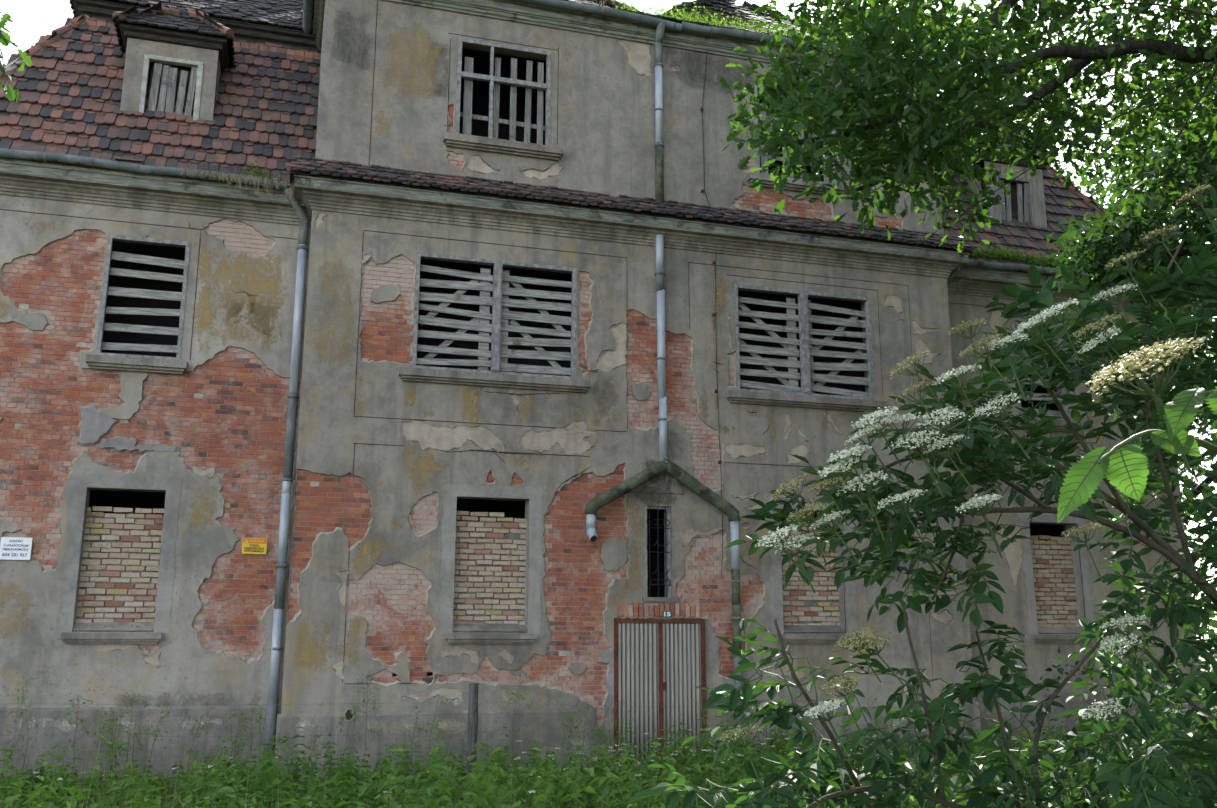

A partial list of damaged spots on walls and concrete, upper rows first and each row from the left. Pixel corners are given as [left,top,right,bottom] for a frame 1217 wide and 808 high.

peeling [446,150,500,174]
peeling [518,163,564,179]
spalling [731,156,835,221]
spalling [187,218,287,259]
leakage [197,258,280,341]
spalling [356,251,416,367]
spalling [578,271,766,492]
spalling [0,228,373,664]
peeling [400,420,597,455]
spalling [335,463,766,731]